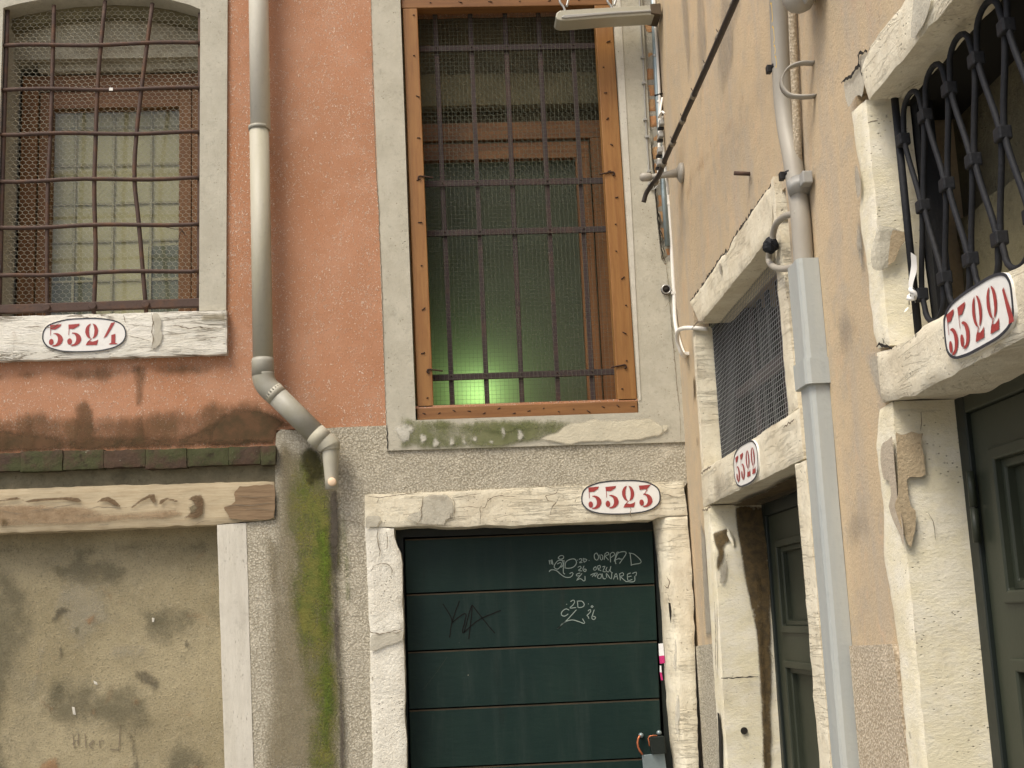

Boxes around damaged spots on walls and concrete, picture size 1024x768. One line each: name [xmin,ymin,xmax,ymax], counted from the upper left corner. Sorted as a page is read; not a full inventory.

leakage [0,402,335,768]
peeling [224,484,275,520]
spalling [713,529,735,583]
peeling [880,432,926,547]